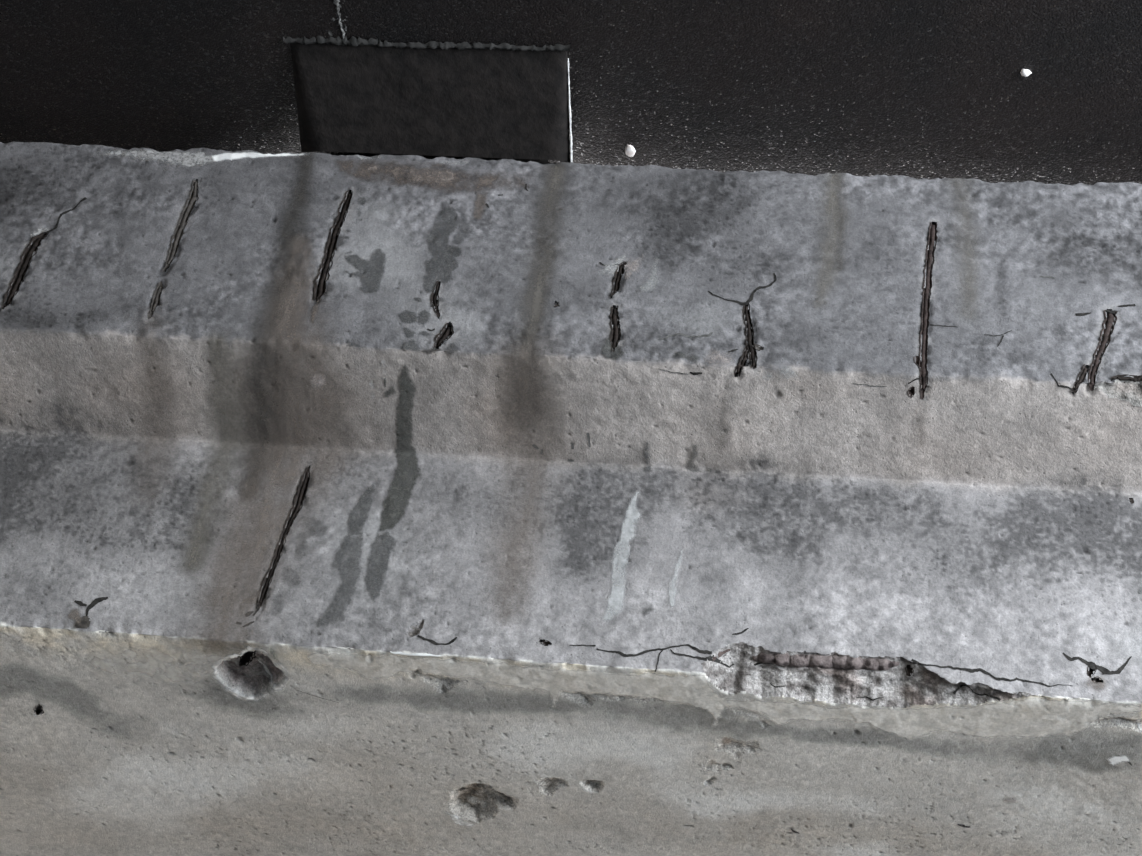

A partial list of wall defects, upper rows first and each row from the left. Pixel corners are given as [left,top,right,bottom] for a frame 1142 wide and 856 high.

spalling [1051,304,1142,407]
damp [317,366,420,627]
spalling [124,646,287,701]
crack [570,628,749,681]
crack [910,652,1132,688]
peeling [308,642,1142,786]
spalling [443,783,519,826]